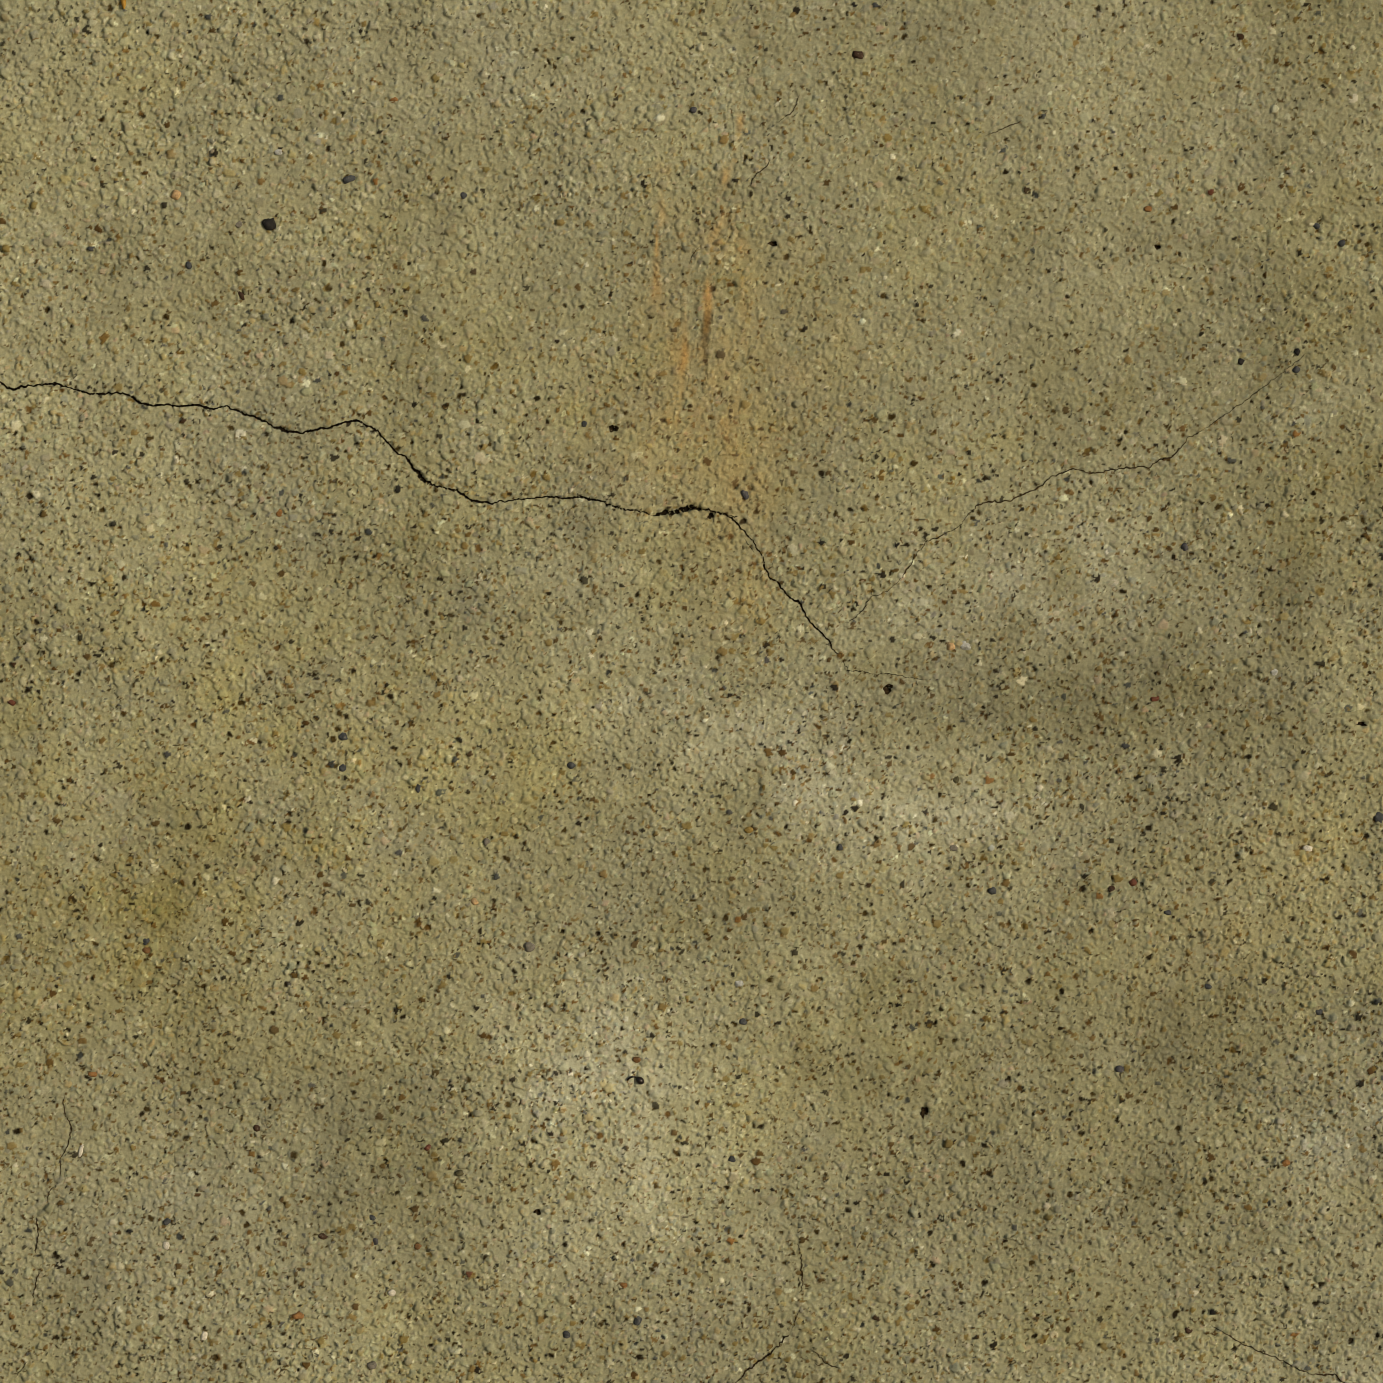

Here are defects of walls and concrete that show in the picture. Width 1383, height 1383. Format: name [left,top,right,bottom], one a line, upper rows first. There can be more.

crack [0,355,1304,680]